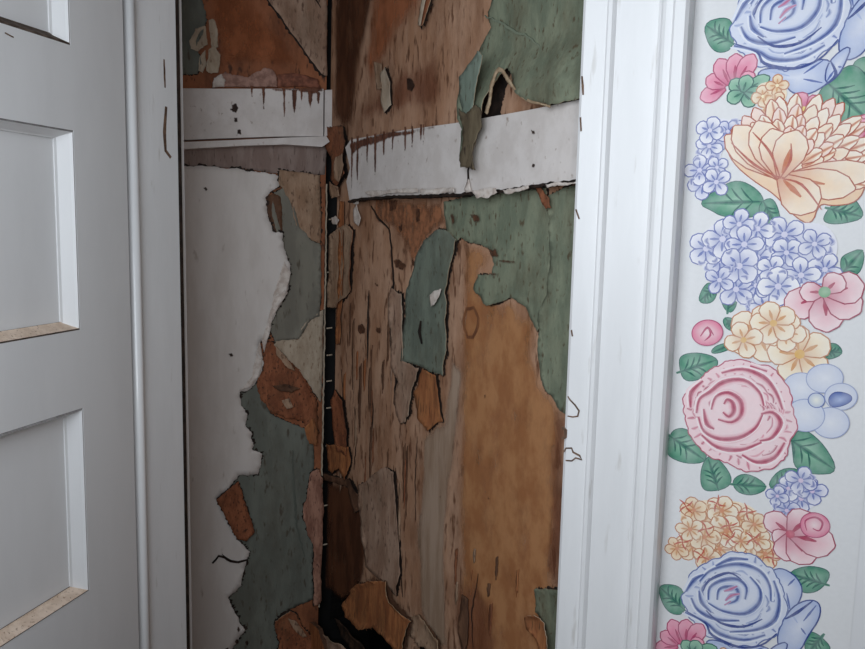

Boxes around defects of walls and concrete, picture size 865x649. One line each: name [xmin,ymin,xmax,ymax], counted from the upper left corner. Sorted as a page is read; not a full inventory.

peeling [418,0,433,29]
peeling [189,19,221,74]
spalling [373,61,393,114]
peeling [353,202,361,226]
peeling [429,289,441,306]
peeling [184,125,349,649]
spalling [329,589,392,649]